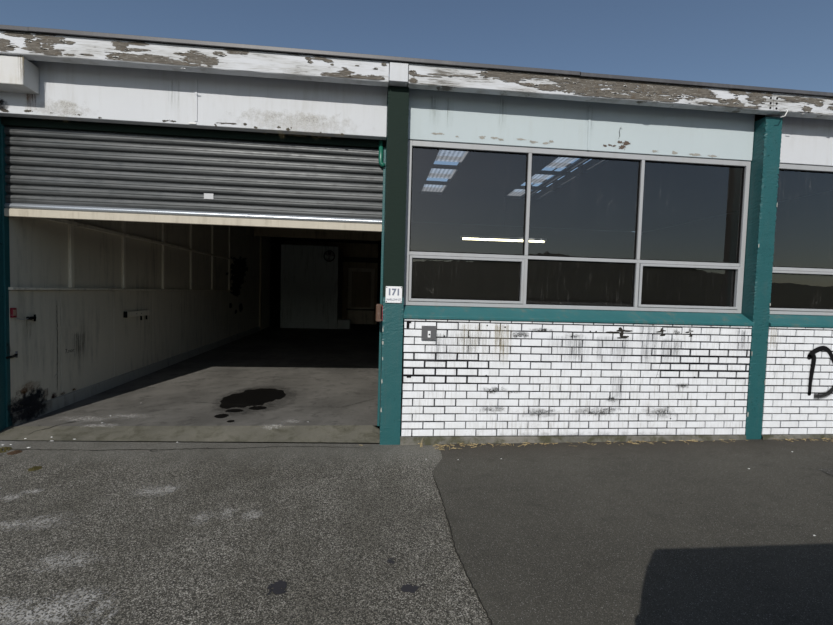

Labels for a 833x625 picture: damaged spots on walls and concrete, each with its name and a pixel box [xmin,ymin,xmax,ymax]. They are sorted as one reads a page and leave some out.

peeling [0,31,93,56]
peeling [105,41,249,69]
peeling [408,70,833,113]